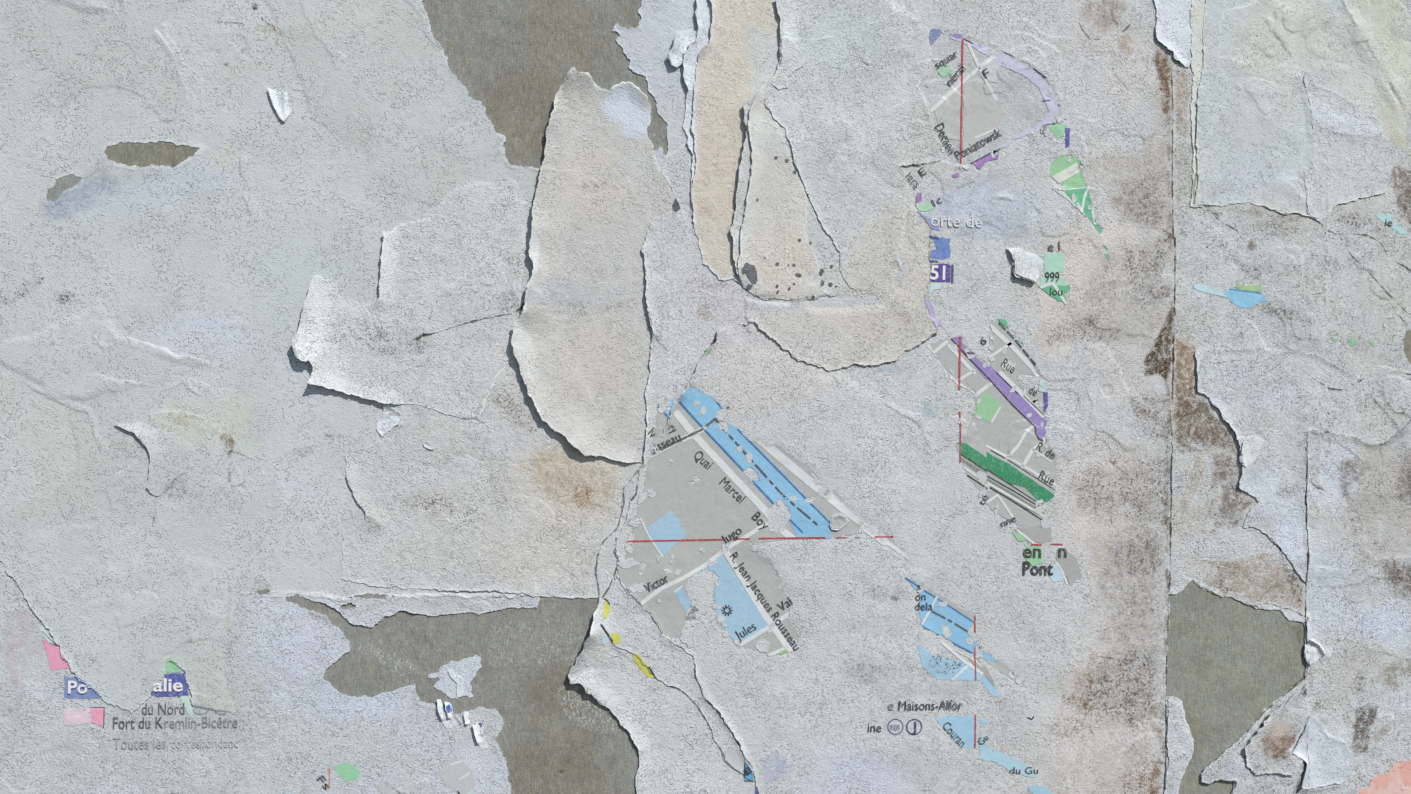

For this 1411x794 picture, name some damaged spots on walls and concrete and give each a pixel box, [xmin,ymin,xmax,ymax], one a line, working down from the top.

peeling [46,174,82,201]
peeling [104,141,200,168]
peeling [290,0,681,463]
crack [1169,78,1177,399]
peeling [1403,330,1411,364]
peeling [285,594,639,794]
peeling [1165,581,1326,794]